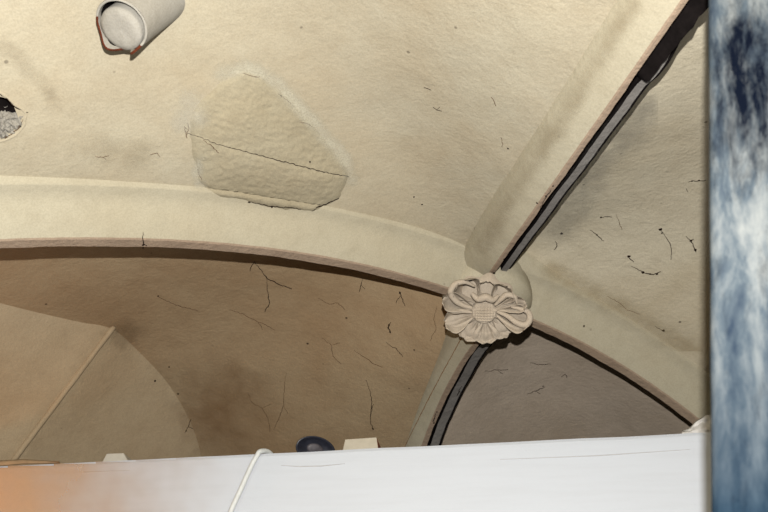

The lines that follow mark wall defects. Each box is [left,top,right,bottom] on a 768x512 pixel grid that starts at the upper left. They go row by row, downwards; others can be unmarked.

hole [0,92,28,143]
crack [658,228,697,255]
crack [232,263,291,330]
crack [324,339,381,430]
crack [404,338,462,447]